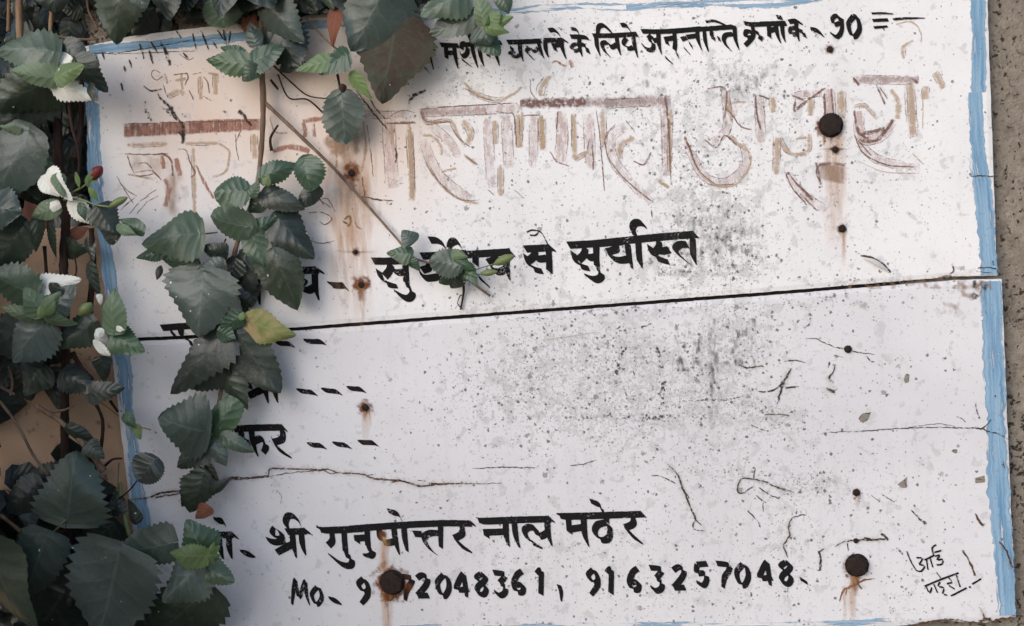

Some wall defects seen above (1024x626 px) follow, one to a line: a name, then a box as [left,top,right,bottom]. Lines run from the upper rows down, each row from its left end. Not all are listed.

corrosion [325,137,358,186]
corrosion [353,277,370,297]
crack [831,404,1005,437]
crack [232,468,500,487]
crack [143,490,181,499]
crack [652,466,703,531]
corrosion [376,531,412,618]